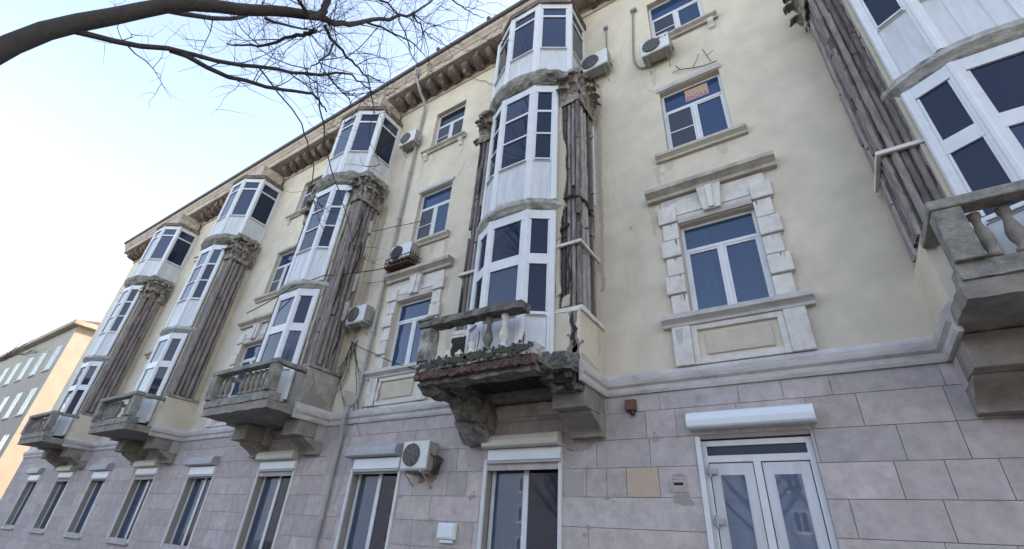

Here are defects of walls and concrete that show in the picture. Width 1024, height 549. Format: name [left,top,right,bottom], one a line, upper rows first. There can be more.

flaking render [413,281,584,405]
crack [560,194,594,353]